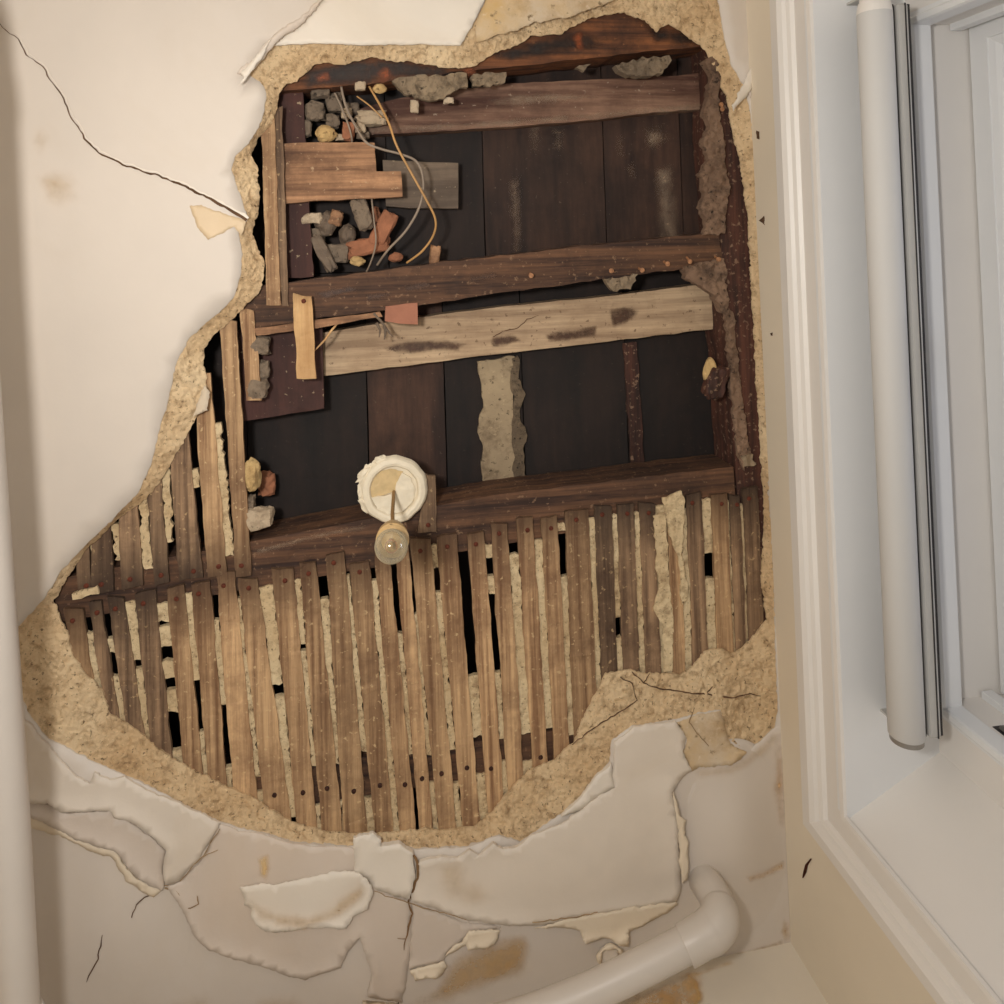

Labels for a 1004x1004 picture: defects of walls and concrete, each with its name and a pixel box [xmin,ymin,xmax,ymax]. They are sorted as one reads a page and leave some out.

crack [0,24,249,221]
spalling [18,0,778,1004]
crack [572,672,759,746]
crack [86,937,102,982]
crack [131,829,220,918]
crack [374,854,466,947]
crack [532,912,598,923]